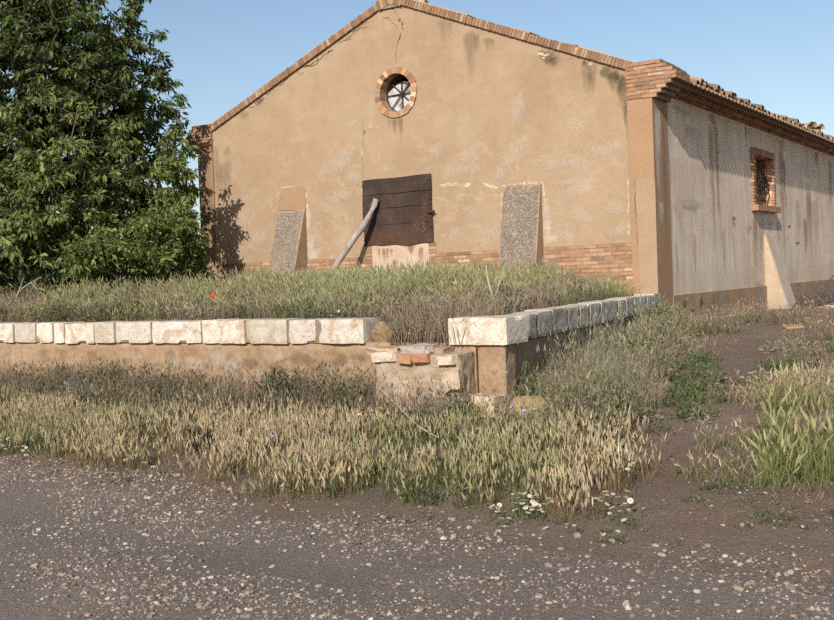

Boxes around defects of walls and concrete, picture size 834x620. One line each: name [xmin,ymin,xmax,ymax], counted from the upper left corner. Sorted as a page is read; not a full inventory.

crack [254,25,369,105]